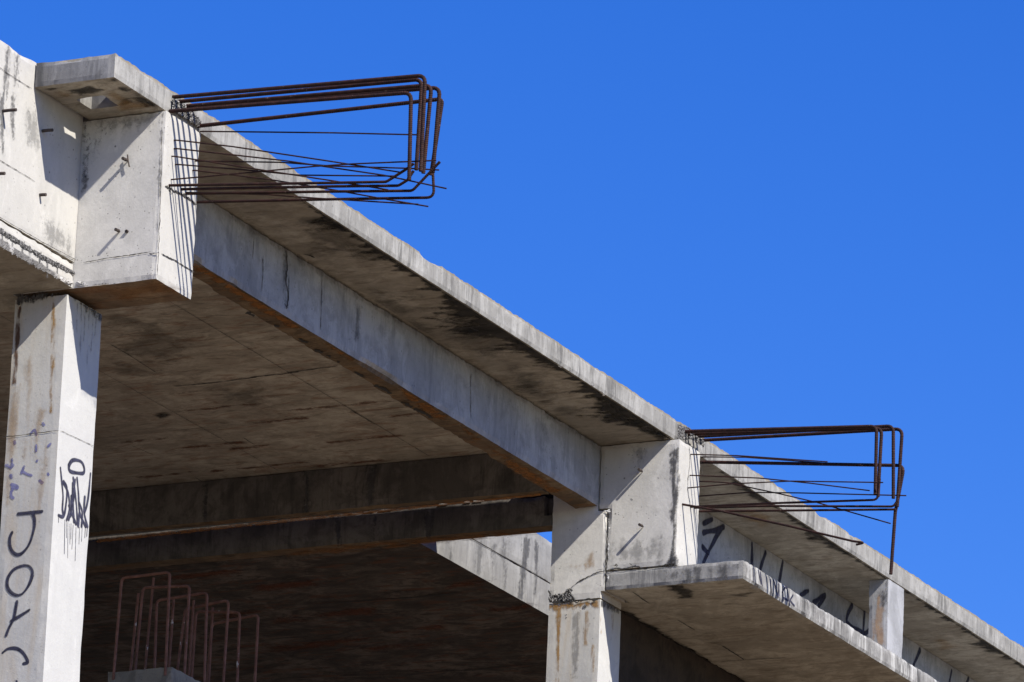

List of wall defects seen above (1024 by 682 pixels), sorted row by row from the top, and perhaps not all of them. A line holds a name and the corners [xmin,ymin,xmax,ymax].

corrosion [13,306,21,384]
water stain [309,206,680,567]
corrosion [550,600,598,663]